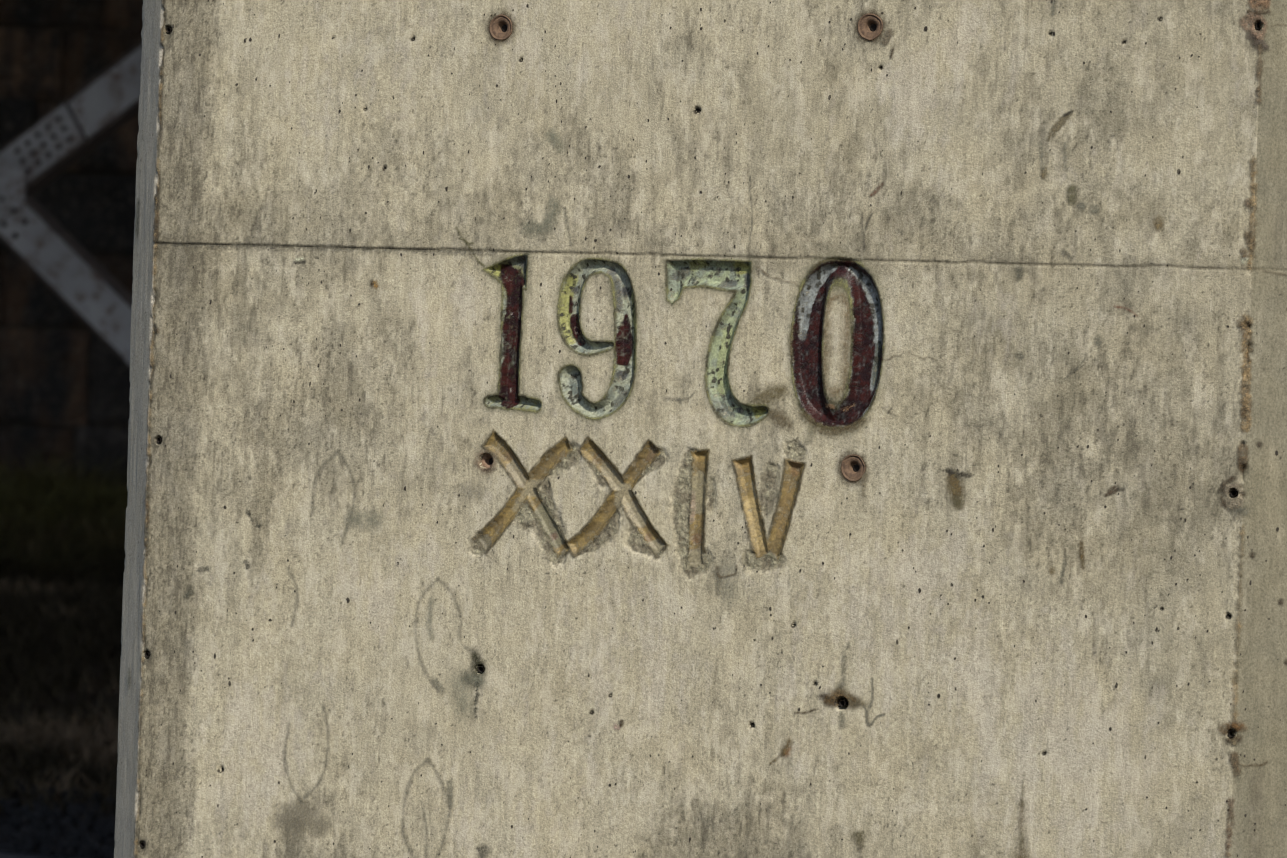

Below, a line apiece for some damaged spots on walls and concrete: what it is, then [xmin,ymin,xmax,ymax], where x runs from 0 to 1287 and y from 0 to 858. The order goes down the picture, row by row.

rust [838,453,867,483]